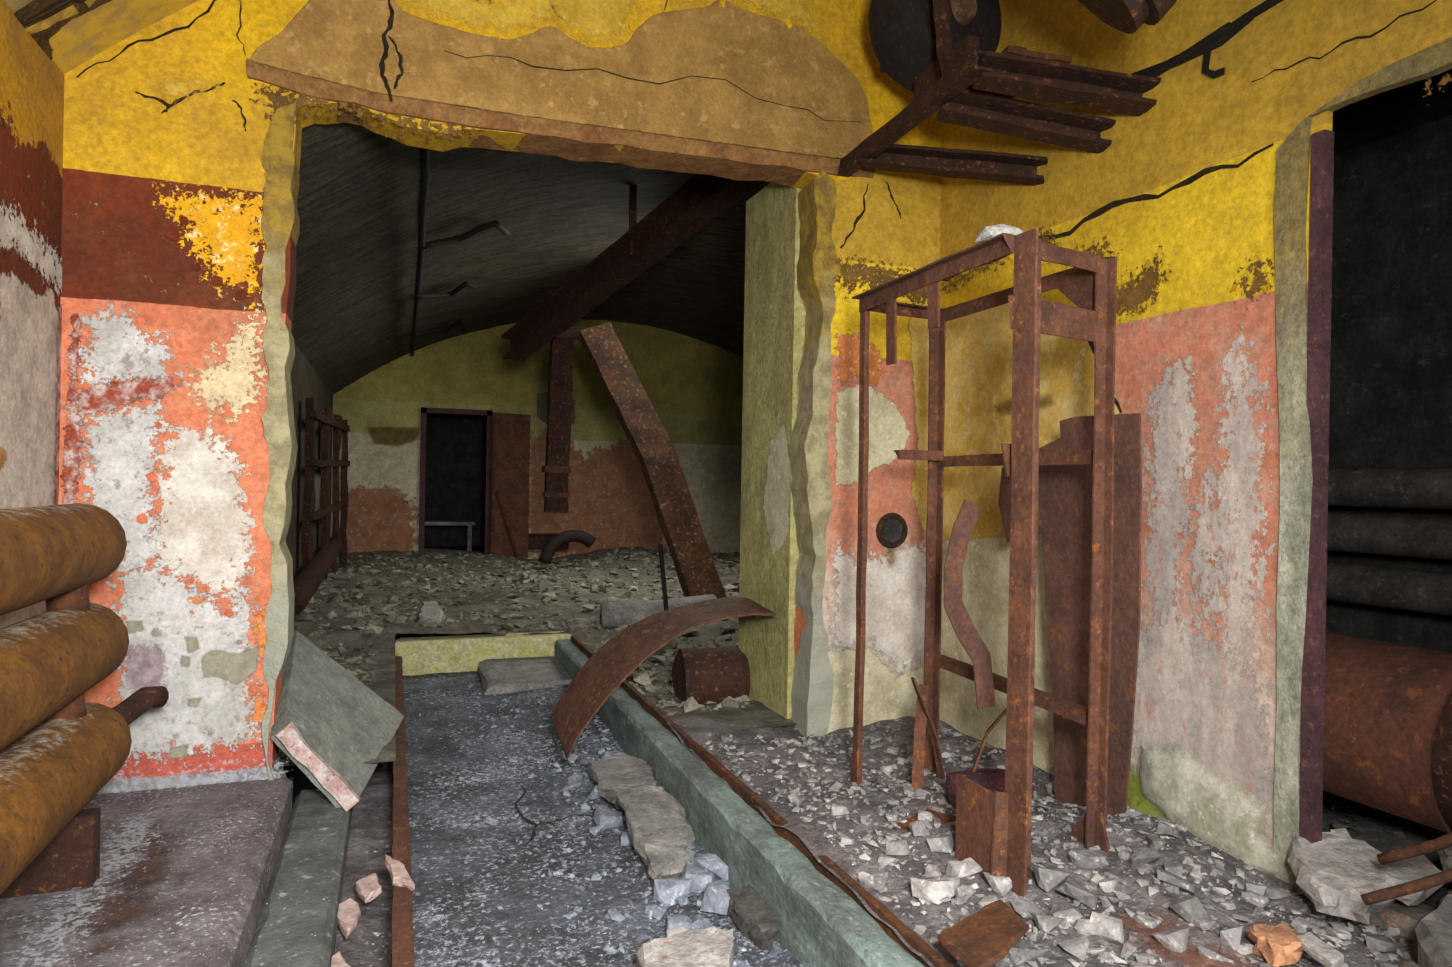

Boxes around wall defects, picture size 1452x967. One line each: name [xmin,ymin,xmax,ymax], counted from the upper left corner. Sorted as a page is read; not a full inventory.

crack [76,0,247,131]
peeling [150,77,221,96]
crack [379,0,404,101]
spalling [247,0,875,186]
crack [1252,0,1437,82]
crack [941,143,1274,281]
peeling [1039,334,1094,448]
peeling [0,177,360,812]
peeling [827,252,1014,749]
peeling [1132,253,1278,849]
peeling [1033,533,1054,771]